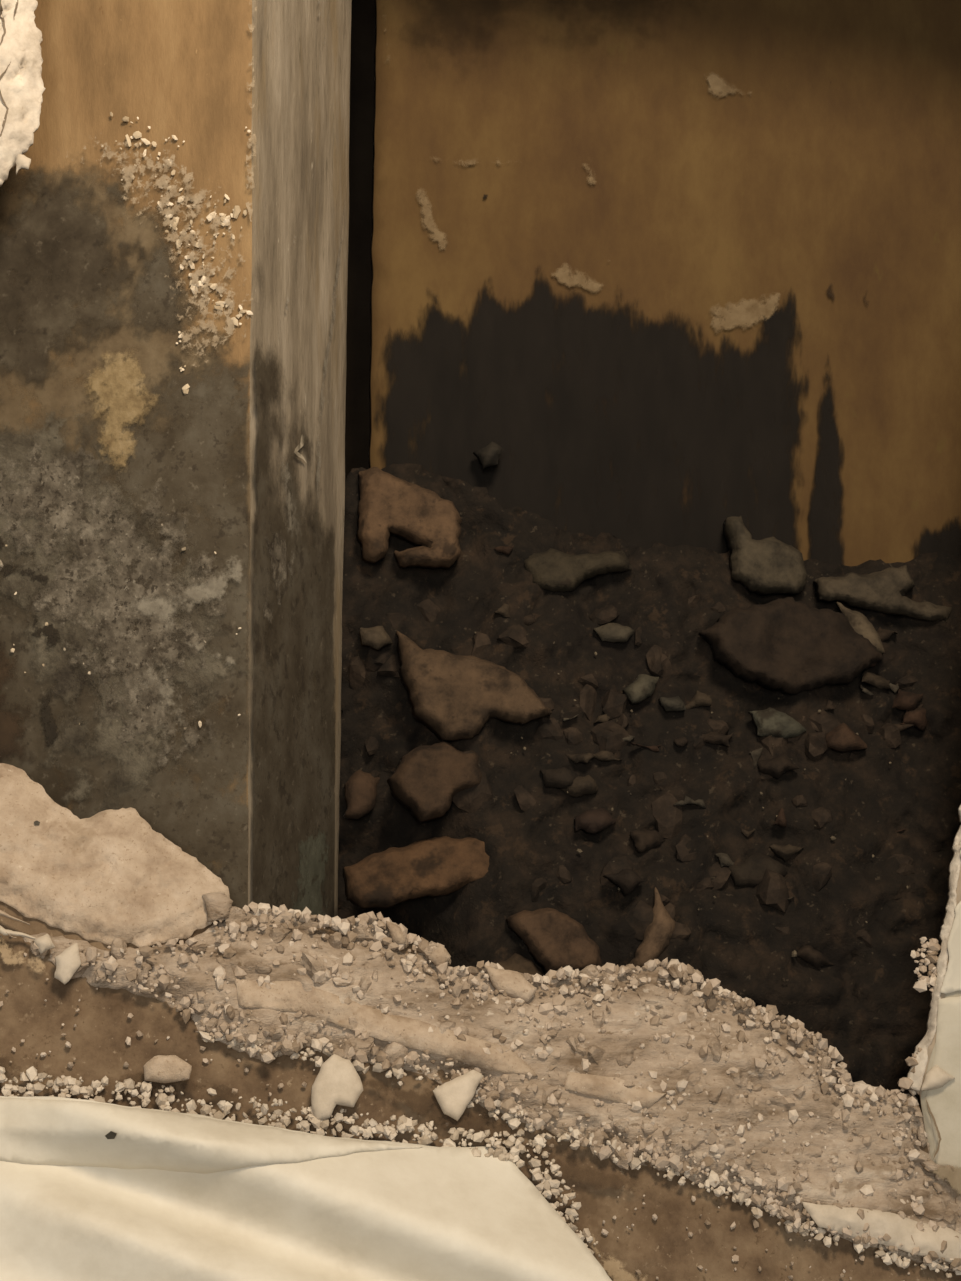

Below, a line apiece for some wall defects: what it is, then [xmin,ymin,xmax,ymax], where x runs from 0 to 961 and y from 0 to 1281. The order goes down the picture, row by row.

crack [0,0,18,137]
flaking render [0,0,45,187]
peeling [707,74,737,96]
peeling [417,189,447,249]
peeling [552,264,602,292]
peeling [711,293,780,333]
leakage [376,278,844,565]
leakage [0,112,336,918]
leakage [914,518,961,558]
flaking render [0,763,961,1281]